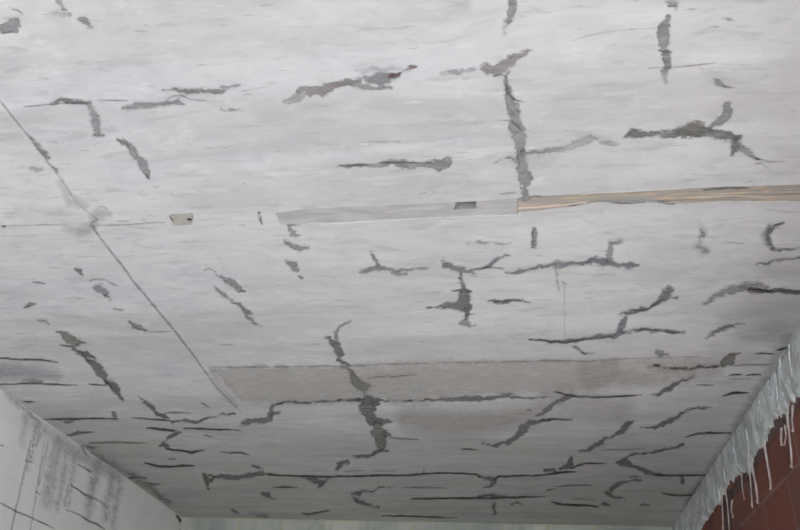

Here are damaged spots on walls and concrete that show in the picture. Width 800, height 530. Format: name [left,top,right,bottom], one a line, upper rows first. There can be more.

crack [506,0,516,24]
crack [657,5,677,81]
crack [53,98,150,179]
crack [340,157,452,171]
crack [449,50,759,201]
crack [216,276,258,325]
crack [359,241,639,281]
crack [538,287,682,355]
crack [703,223,800,305]
crack [0,321,787,518]
water stain [723,403,800,530]